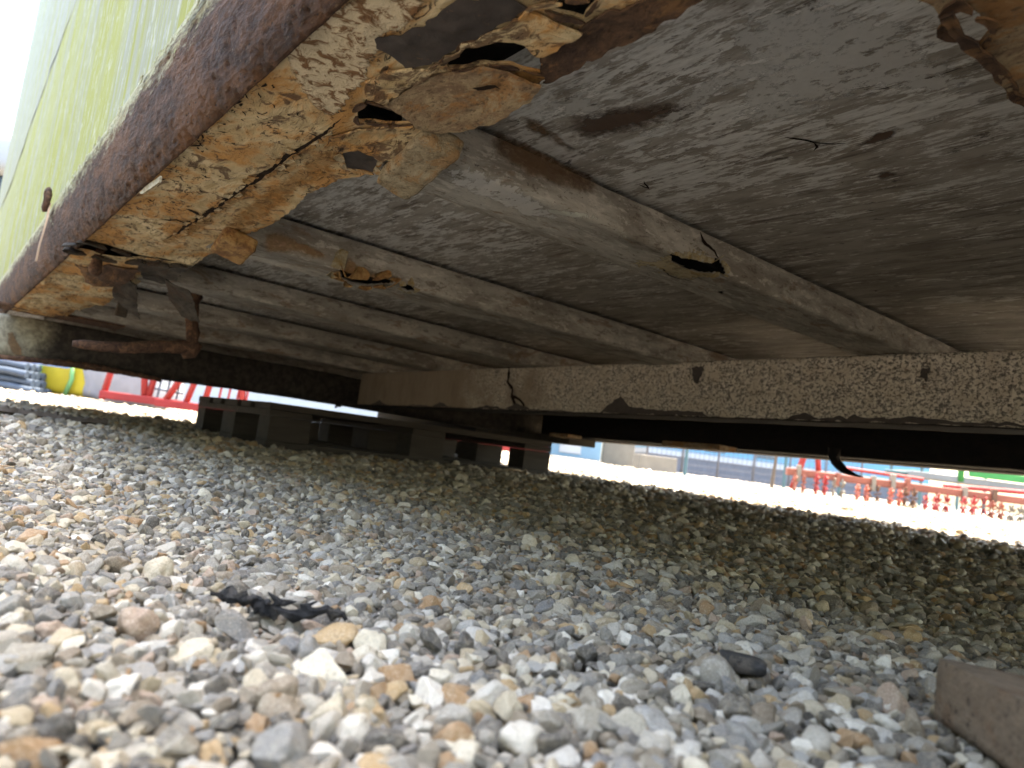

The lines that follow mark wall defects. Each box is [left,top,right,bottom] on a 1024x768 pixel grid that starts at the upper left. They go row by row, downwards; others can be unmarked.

peeling [57,0,200,204]
crack [131,83,341,240]
peeling [324,126,421,175]
peeling [364,0,582,106]
peeling [659,252,731,278]
crack [507,369,525,411]